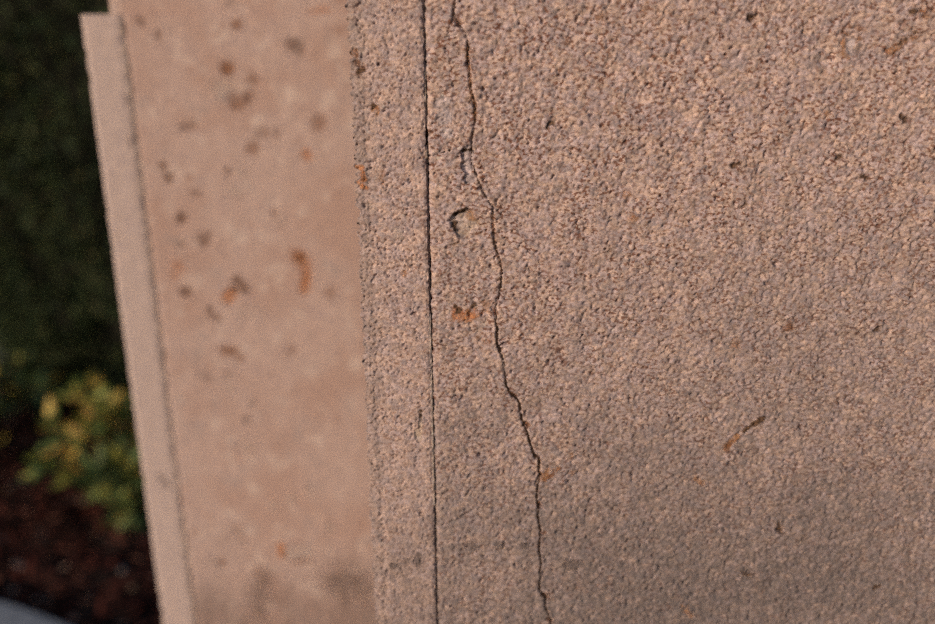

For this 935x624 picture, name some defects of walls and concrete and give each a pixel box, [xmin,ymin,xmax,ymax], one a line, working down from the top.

corrosion [452,296,478,322]
crack [435,2,552,624]
corrosion [724,416,765,450]